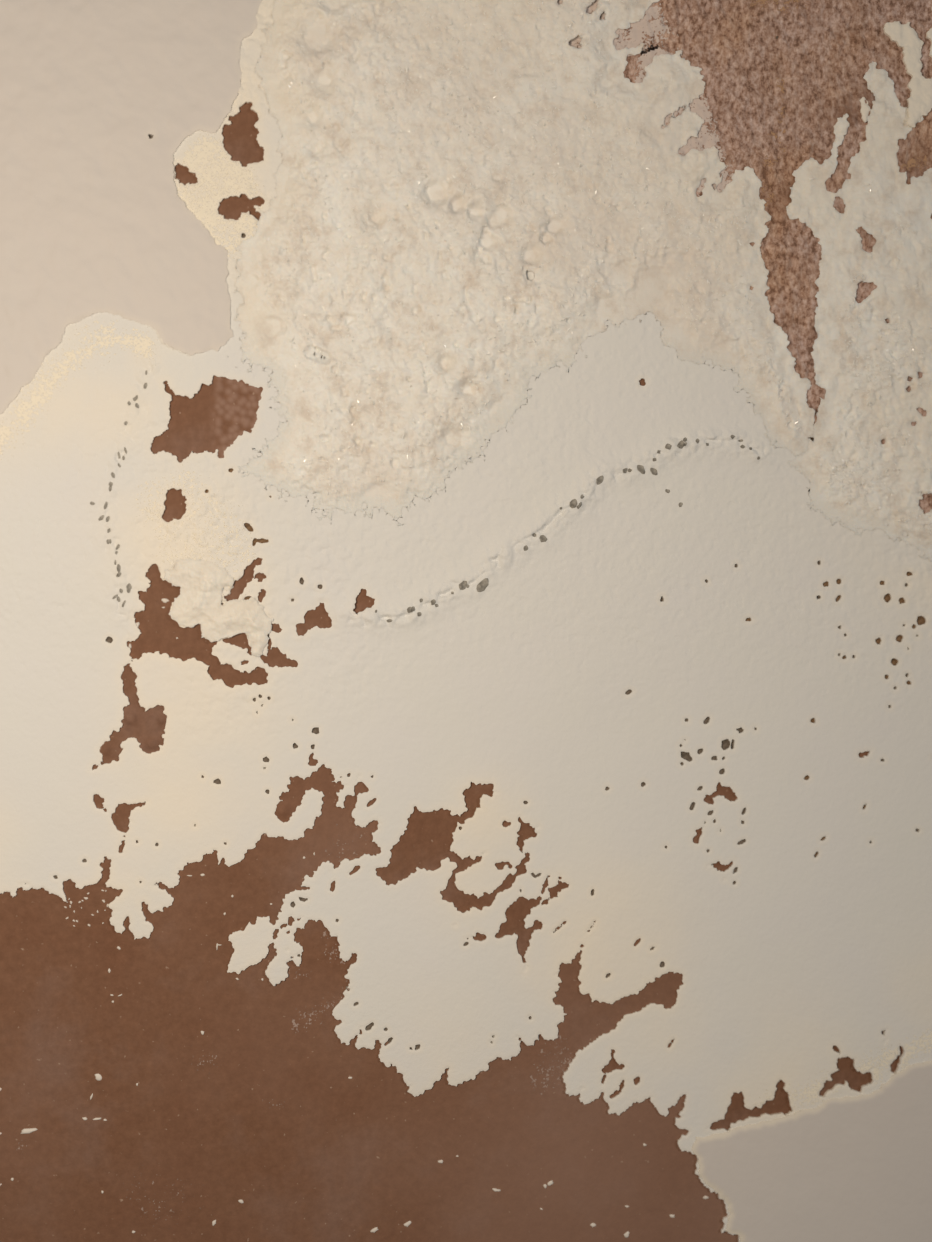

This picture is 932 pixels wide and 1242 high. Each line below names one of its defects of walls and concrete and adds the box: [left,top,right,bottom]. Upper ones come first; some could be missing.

peeling [222,103,264,167]
peeling [175,164,198,185]
peeling [218,194,265,220]
spalling [616,0,932,424]
peeling [151,376,263,463]
peeling [162,488,187,522]
peeling [127,558,268,688]
peeling [260,634,298,667]
peeling [100,663,167,765]
peeling [0,764,741,1242]
peeling [710,1080,792,1130]
peeling [819,1057,872,1096]